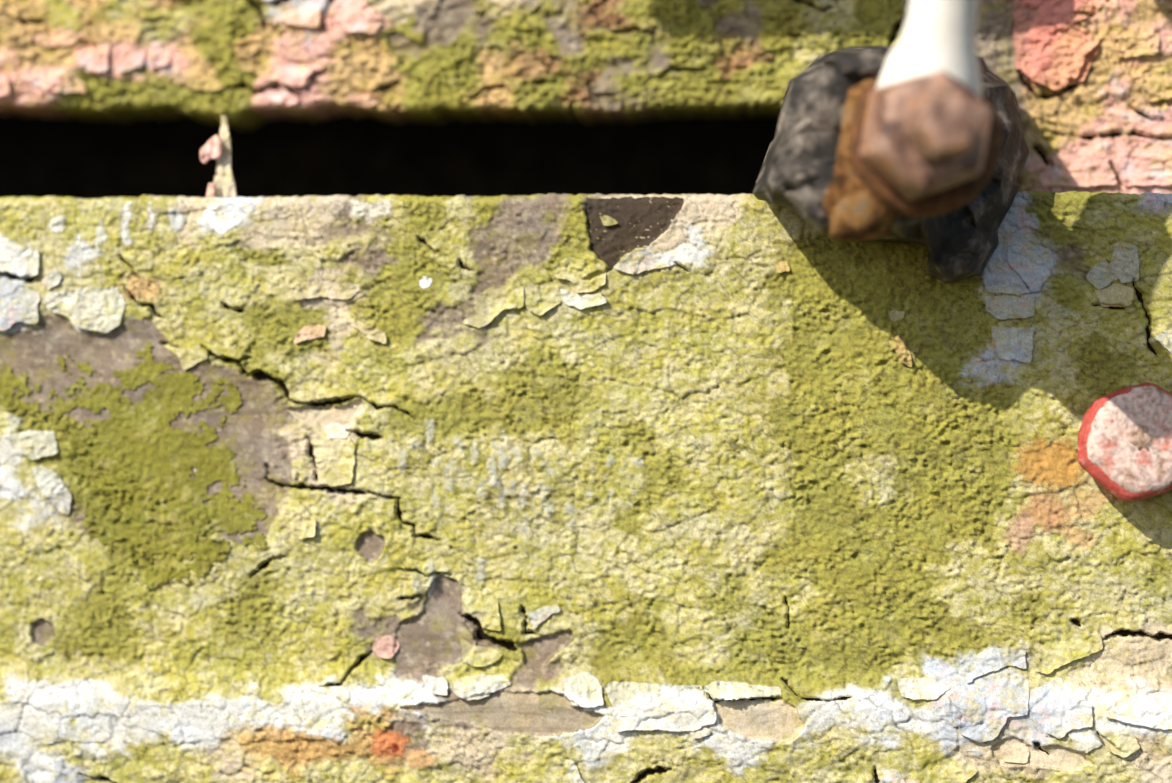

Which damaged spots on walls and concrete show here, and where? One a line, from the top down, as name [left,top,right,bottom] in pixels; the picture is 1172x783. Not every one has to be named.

peeling [1013,0,1172,102]
peeling [1039,141,1172,187]
peeling [461,196,684,328]
peeling [0,235,365,545]
crack [208,350,413,440]
crack [267,437,439,540]
crack [251,556,285,577]
crack [399,569,451,600]
peeling [373,574,804,743]
peeling [959,632,1172,773]
crack [1071,619,1172,640]
crack [632,766,670,783]